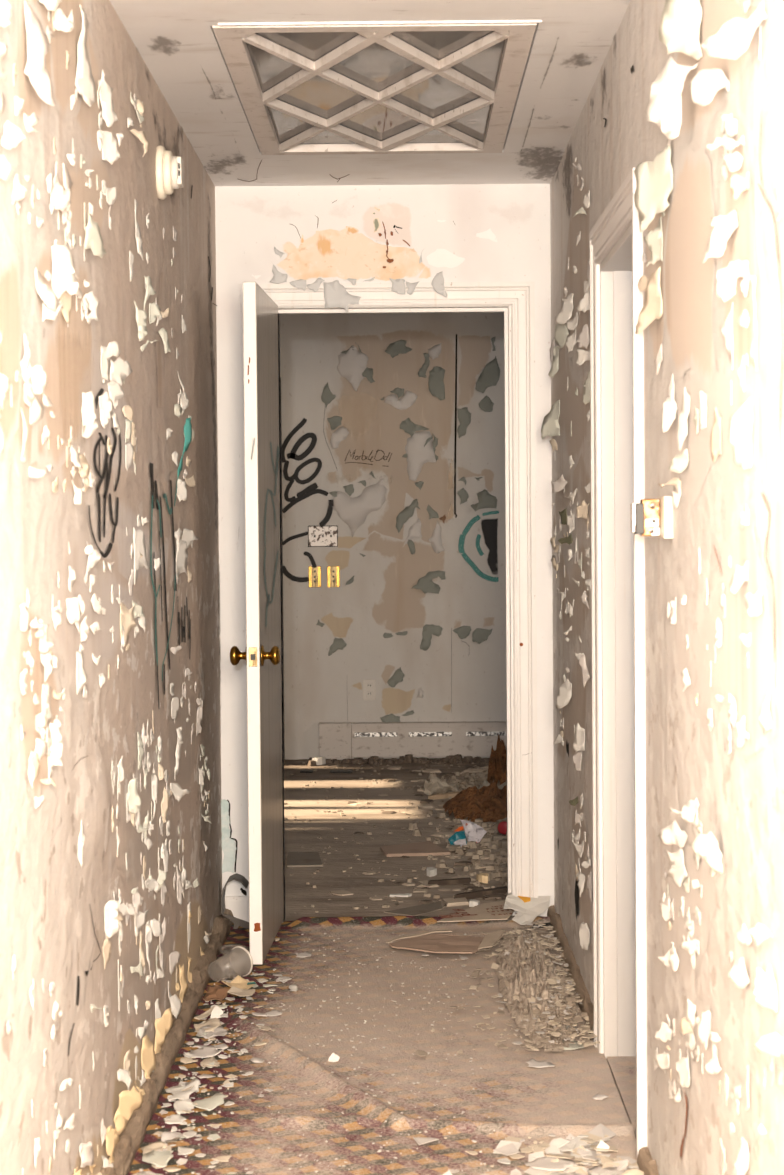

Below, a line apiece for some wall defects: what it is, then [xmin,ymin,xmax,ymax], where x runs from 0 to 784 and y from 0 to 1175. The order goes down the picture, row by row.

peeling [0,0,200,814]
peeling [316,610,355,656]
peeling [270,201,447,313]
peeling [380,663,424,722]
peeling [321,328,500,651]
peeling [541,151,592,953]
peeling [634,0,774,508]
peeling [666,483,784,760]
peeling [15,639,236,1175]
peeling [653,794,784,1175]